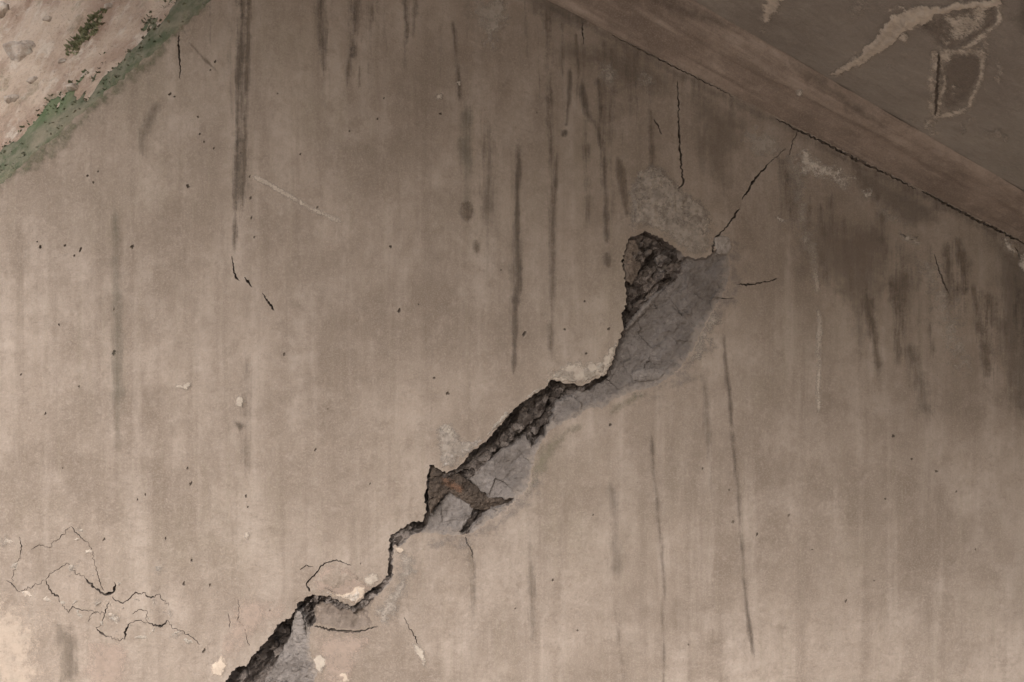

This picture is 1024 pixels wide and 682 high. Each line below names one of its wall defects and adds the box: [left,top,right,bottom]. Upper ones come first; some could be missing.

water stain [235,116,246,199]
water stain [236,0,250,91]
crack [612,35,732,189]
peeling [830,0,1003,135]
water stain [512,159,522,371]
water stain [789,150,856,292]
spalling [437,409,510,467]
spalling [524,345,616,399]
crack [225,119,1024,682]
crack [1,526,200,645]
flaking render [300,559,379,603]
peeling [314,638,367,682]